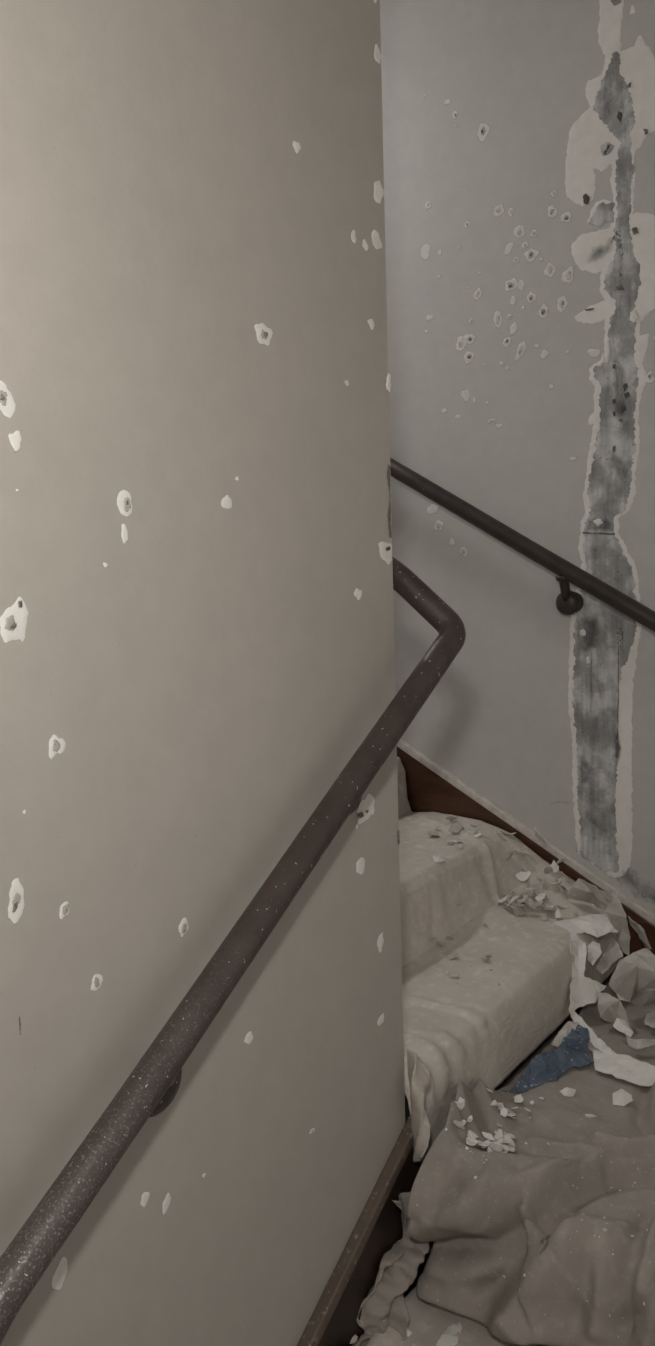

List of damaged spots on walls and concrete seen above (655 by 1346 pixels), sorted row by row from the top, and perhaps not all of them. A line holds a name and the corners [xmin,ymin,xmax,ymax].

peeling [373,180,384,204]
peeling [493,0,655,602]
peeling [254,323,273,346]
peeling [0,380,22,451]
peeling [117,490,132,544]
peeling [0,596,29,643]
peeling [497,588,655,1107]
peeling [7,878,25,924]